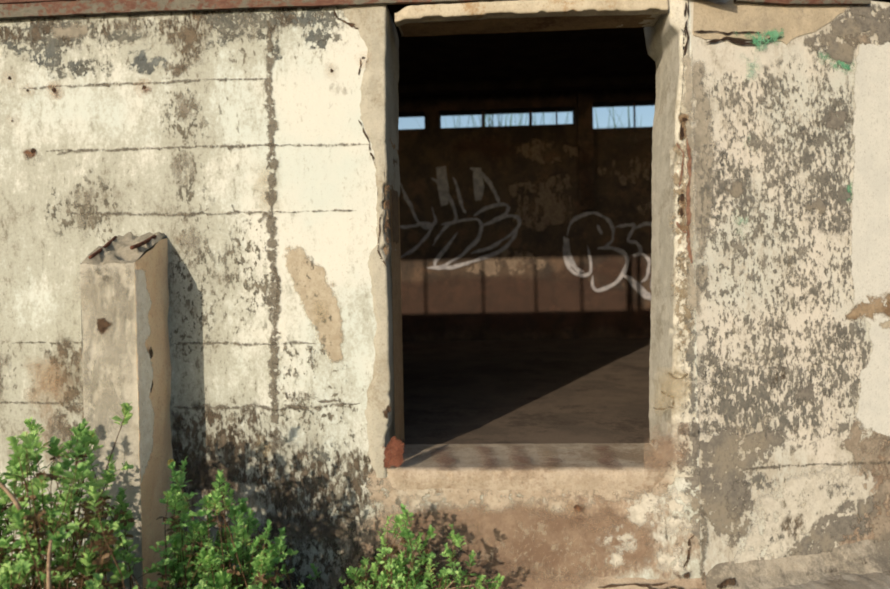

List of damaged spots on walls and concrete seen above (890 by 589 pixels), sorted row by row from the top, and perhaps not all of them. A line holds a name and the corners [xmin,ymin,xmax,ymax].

corrosion [97,318,111,334]
peeling [285,246,343,362]
peeling [441,4,890,579]
damp [278,343,343,435]
corrosion [383,436,405,468]
damp [171,407,684,589]
crack [598,506,708,589]